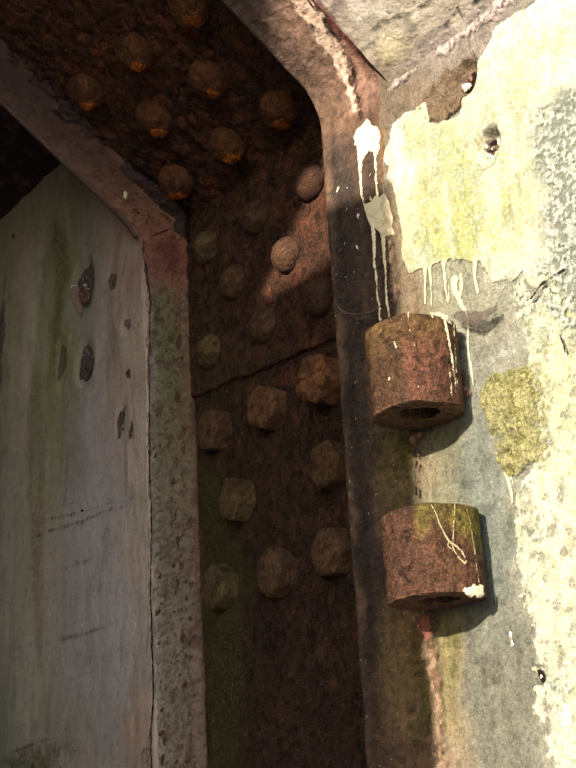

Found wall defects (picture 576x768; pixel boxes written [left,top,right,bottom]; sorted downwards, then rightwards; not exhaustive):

rust [93,158,190,243]
peeling [383,0,576,768]